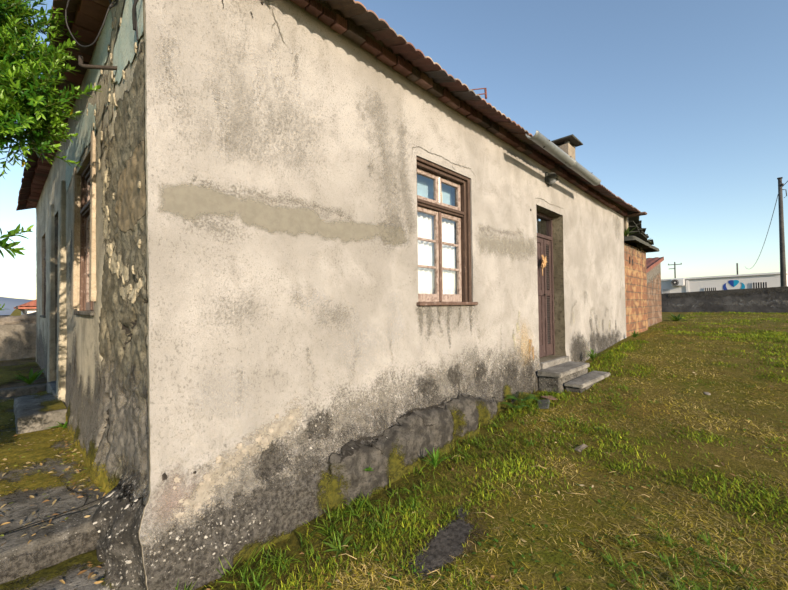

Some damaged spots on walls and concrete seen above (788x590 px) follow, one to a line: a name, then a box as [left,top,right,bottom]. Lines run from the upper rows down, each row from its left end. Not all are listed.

spalling [65,0,149,497]
crack [121,300,148,360]
water stain [418,305,473,347]
water stain [569,315,622,362]
crack [98,365,111,448]
water stain [65,335,149,485]
water stain [140,347,541,590]